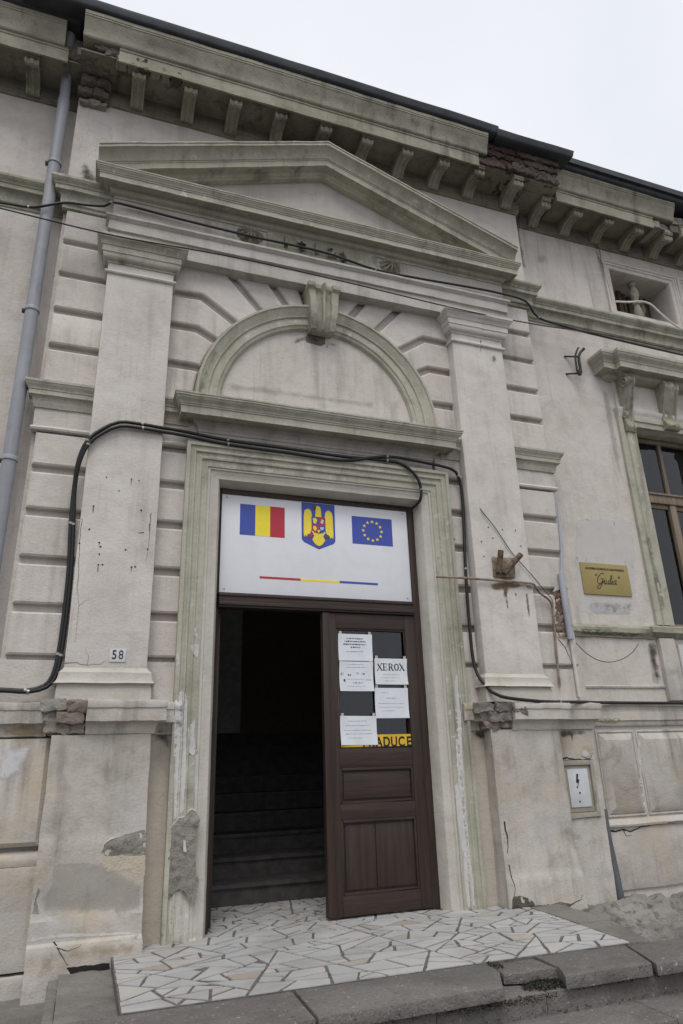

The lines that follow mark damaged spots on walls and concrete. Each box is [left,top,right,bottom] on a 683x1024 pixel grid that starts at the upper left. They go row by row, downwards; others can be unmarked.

spalling [66,39,191,112]
spalling [479,142,560,201]
rust [492,577,531,613]
spalling [40,698,88,737]
flaking render [100,830,146,876]
flaking render [168,688,200,943]
spalling [454,671,529,907]
crack [504,821,516,908]
crack [611,821,682,836]